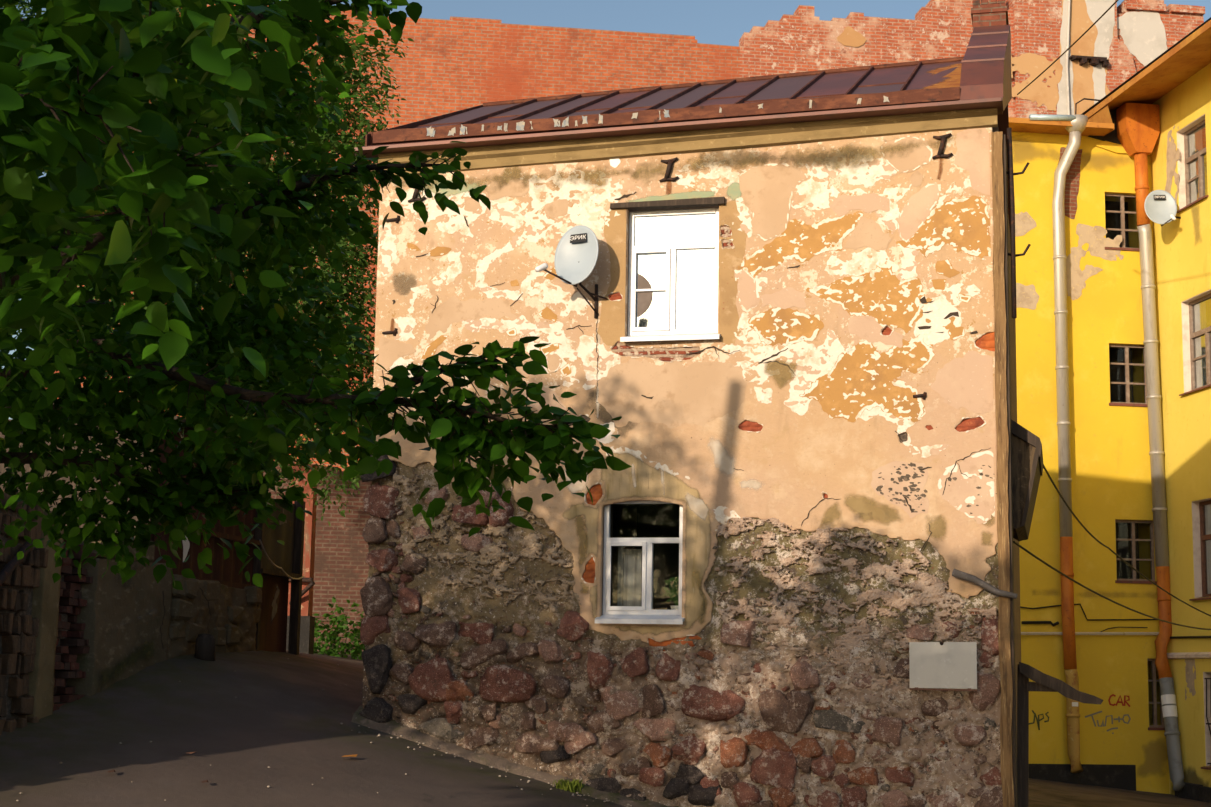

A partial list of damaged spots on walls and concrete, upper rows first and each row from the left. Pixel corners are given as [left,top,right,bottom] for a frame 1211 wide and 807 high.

flaking render [1011,0,1168,115]
water stain [394,275,416,294]
peeling [378,159,701,390]
peeling [674,157,997,524]
peeling [1059,147,1124,300]
crack [903,496,932,551]
crack [919,448,990,494]
spalling [359,455,1003,807]